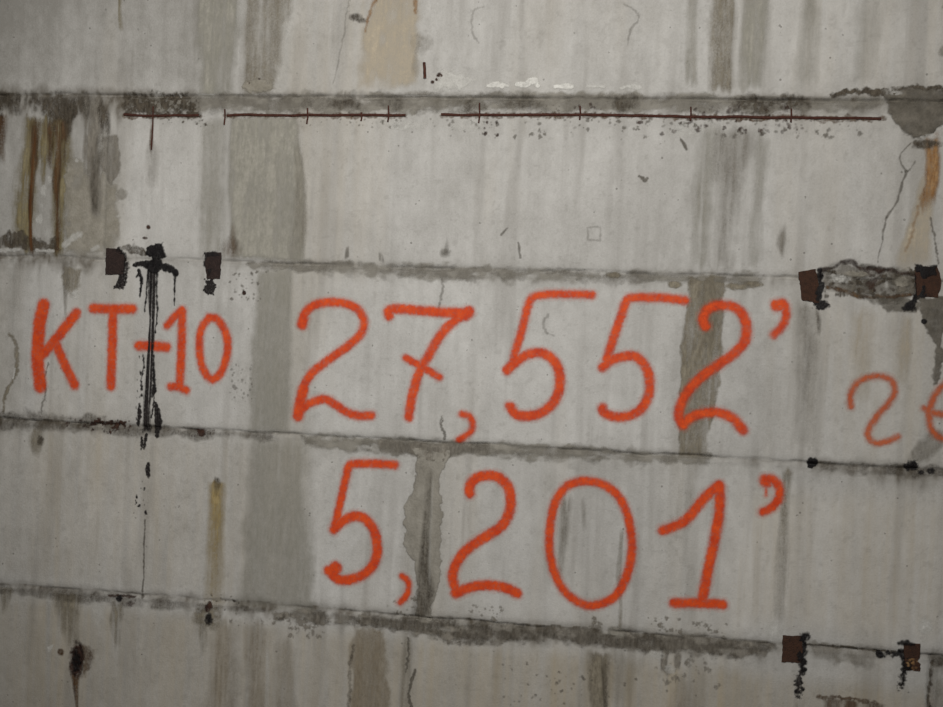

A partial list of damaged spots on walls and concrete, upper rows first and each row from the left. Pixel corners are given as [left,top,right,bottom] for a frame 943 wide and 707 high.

rust [675,114,786,122]
rust [16,114,70,255]
rust [901,139,939,258]
spalling [822,260,918,304]